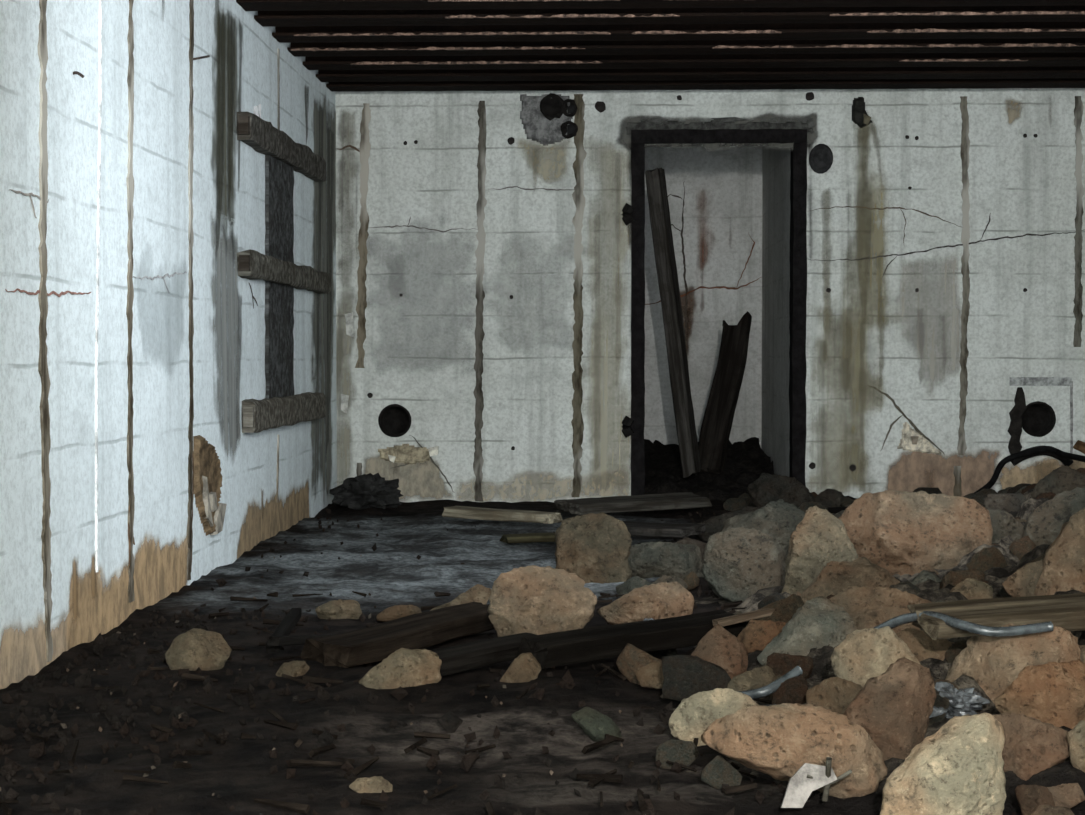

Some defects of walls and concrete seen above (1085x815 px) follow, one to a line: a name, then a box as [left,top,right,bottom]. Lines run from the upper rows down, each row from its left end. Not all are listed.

damp [212,0,242,457]
crack [645,181,761,342]
crack [809,206,1075,278]
rust [680,287,696,351]
spalling [193,435,227,536]
spalling [378,444,439,464]
spalling [897,422,941,454]